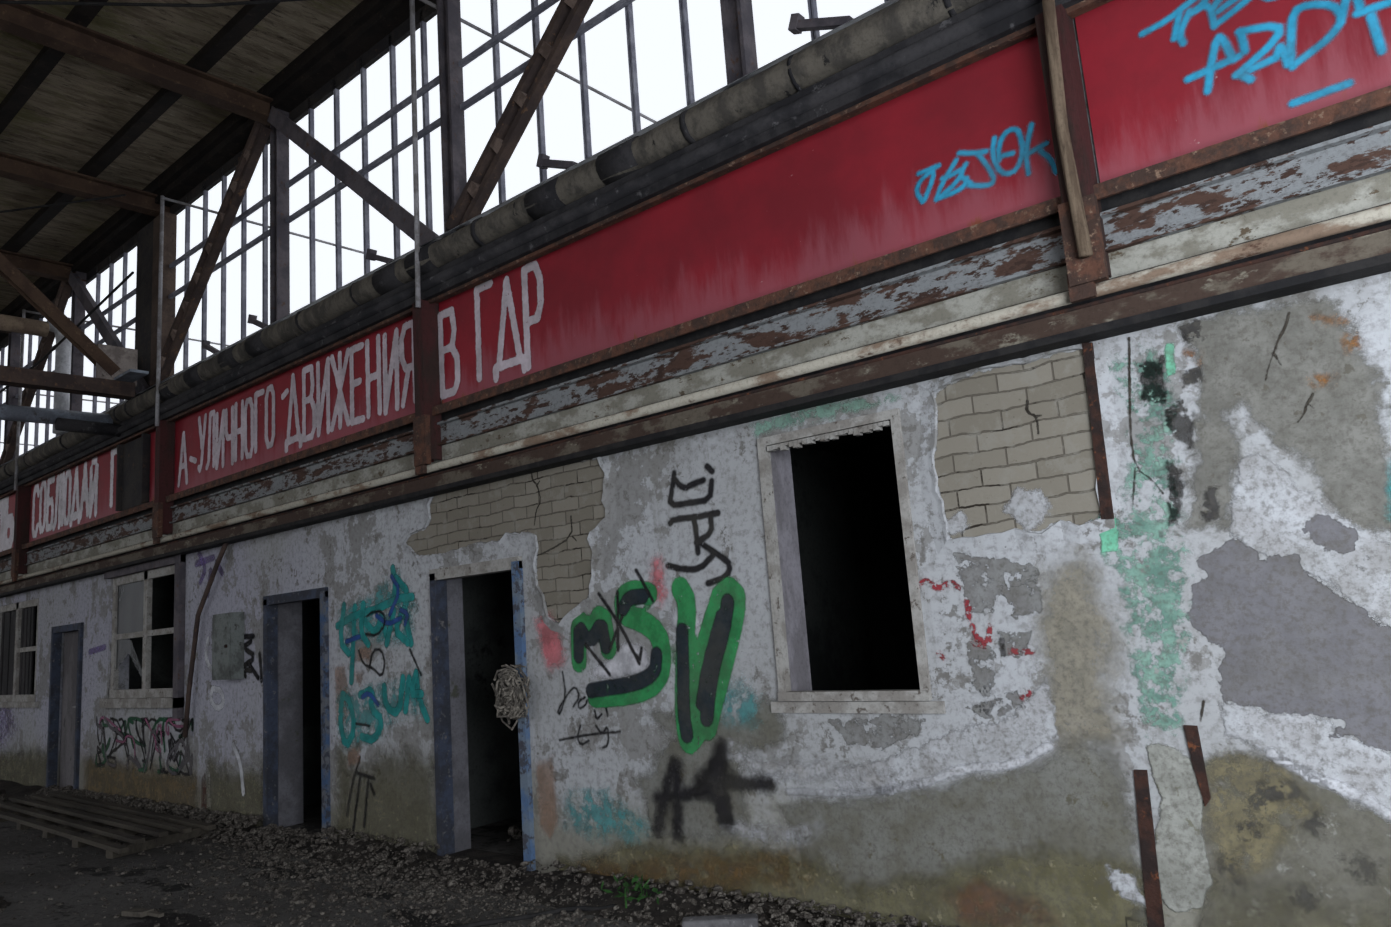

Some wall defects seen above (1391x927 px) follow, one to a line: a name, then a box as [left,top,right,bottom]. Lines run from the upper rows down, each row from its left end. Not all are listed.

spalling [399,457,617,637]
spalling [917,297,1391,912]
leakage [558,562,1148,927]
peeling [828,713,926,749]
rust [1134,769,1165,927]
rust [1183,725,1211,806]
leakage [1198,748,1391,927]